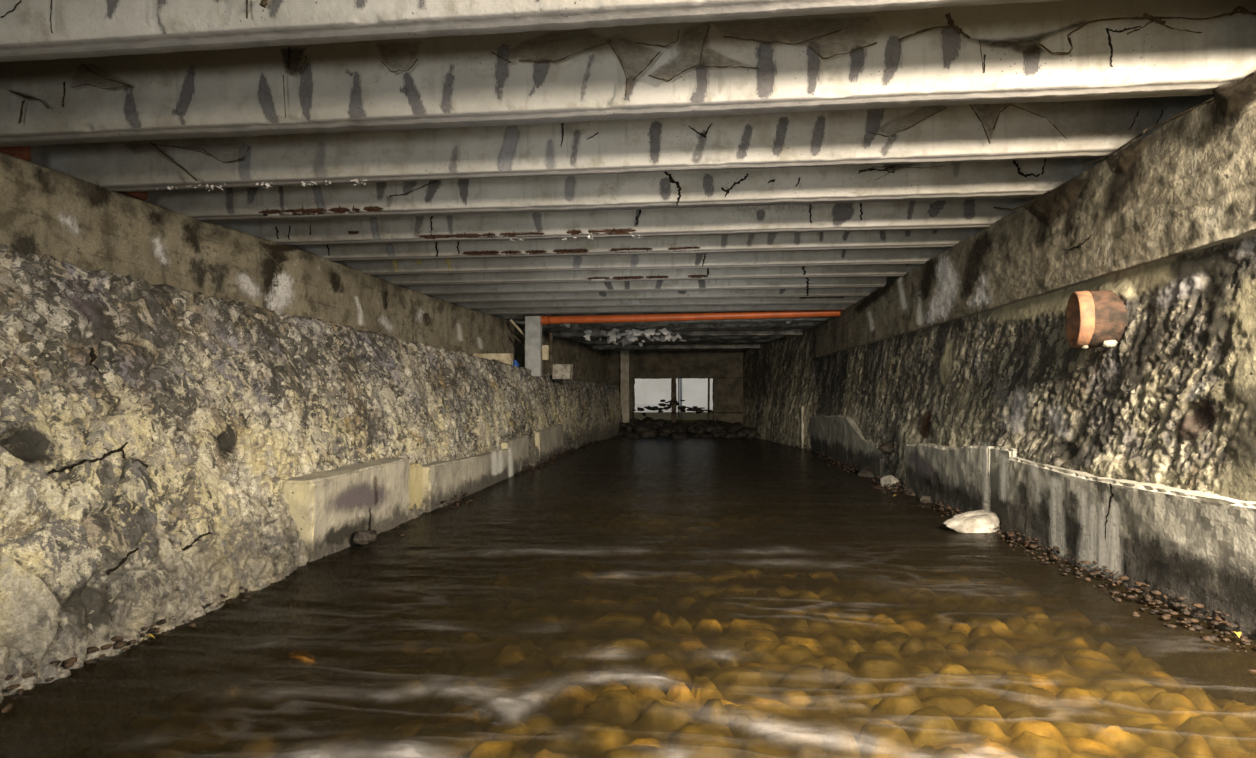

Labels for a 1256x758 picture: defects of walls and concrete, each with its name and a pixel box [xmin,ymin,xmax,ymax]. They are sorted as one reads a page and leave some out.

crack [1106,25,1141,67]
leakage [124,87,141,128]
leakage [172,66,196,125]
leakage [257,73,278,123]
leakage [298,63,313,120]
leakage [346,70,367,118]
leakage [400,65,454,115]
crack [663,172,682,205]
crack [721,173,812,223]
crack [47,442,149,474]
crack [1105,483,1117,540]